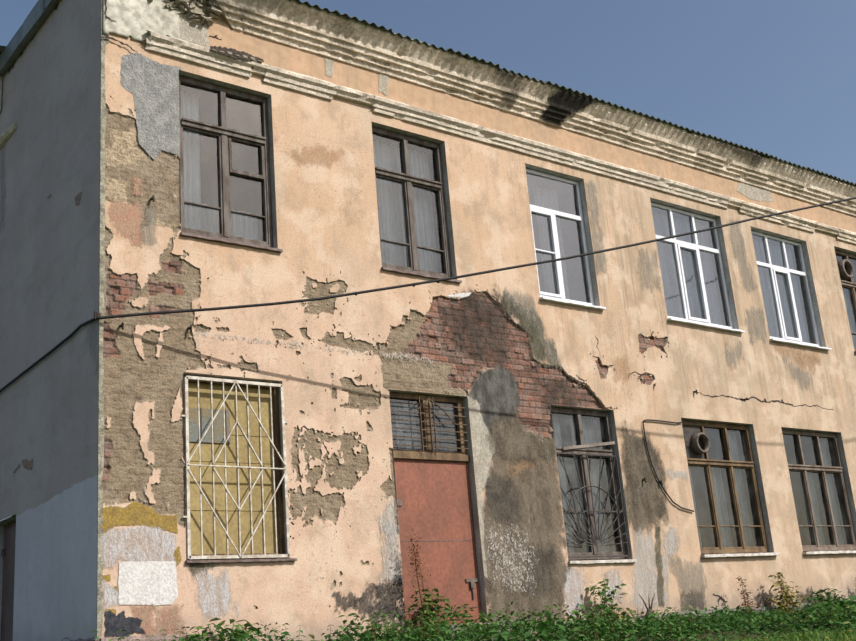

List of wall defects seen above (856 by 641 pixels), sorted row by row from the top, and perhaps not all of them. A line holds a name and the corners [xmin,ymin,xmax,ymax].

spalling [148,0,223,26]
water stain [542,89,596,126]
spalling [102,104,258,528]
spalling [271,271,616,443]
spalling [634,369,655,387]
spalling [638,331,669,358]
crack [698,392,834,410]
peeling [288,402,399,535]
peeling [483,518,540,596]
water stain [481,414,567,623]
water stain [621,421,707,615]